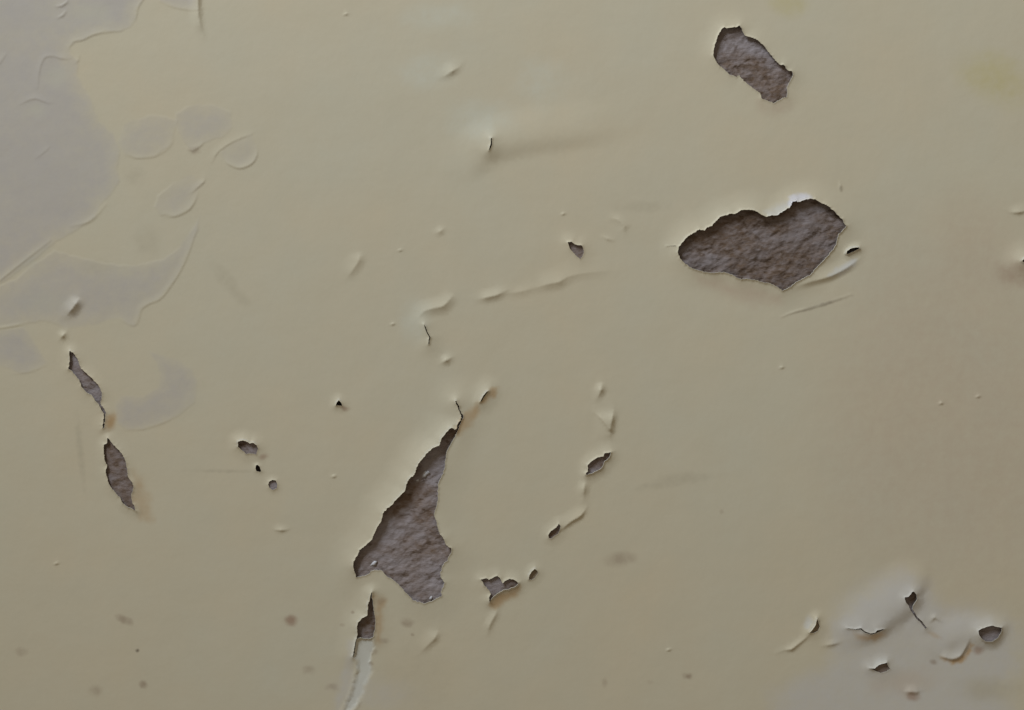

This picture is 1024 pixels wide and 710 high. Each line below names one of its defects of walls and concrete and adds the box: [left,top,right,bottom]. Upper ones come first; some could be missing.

peeling [709,23,796,107]
peeling [564,238,587,262]
peeling [674,196,862,294]
peeling [66,348,139,515]
peeling [235,437,279,492]
peeling [583,450,614,478]
peeling [545,519,564,542]
peeling [344,398,467,710]
peeling [478,566,541,604]
peeling [806,614,824,637]
flaking render [905,592,926,628]
flaking render [975,622,1005,645]